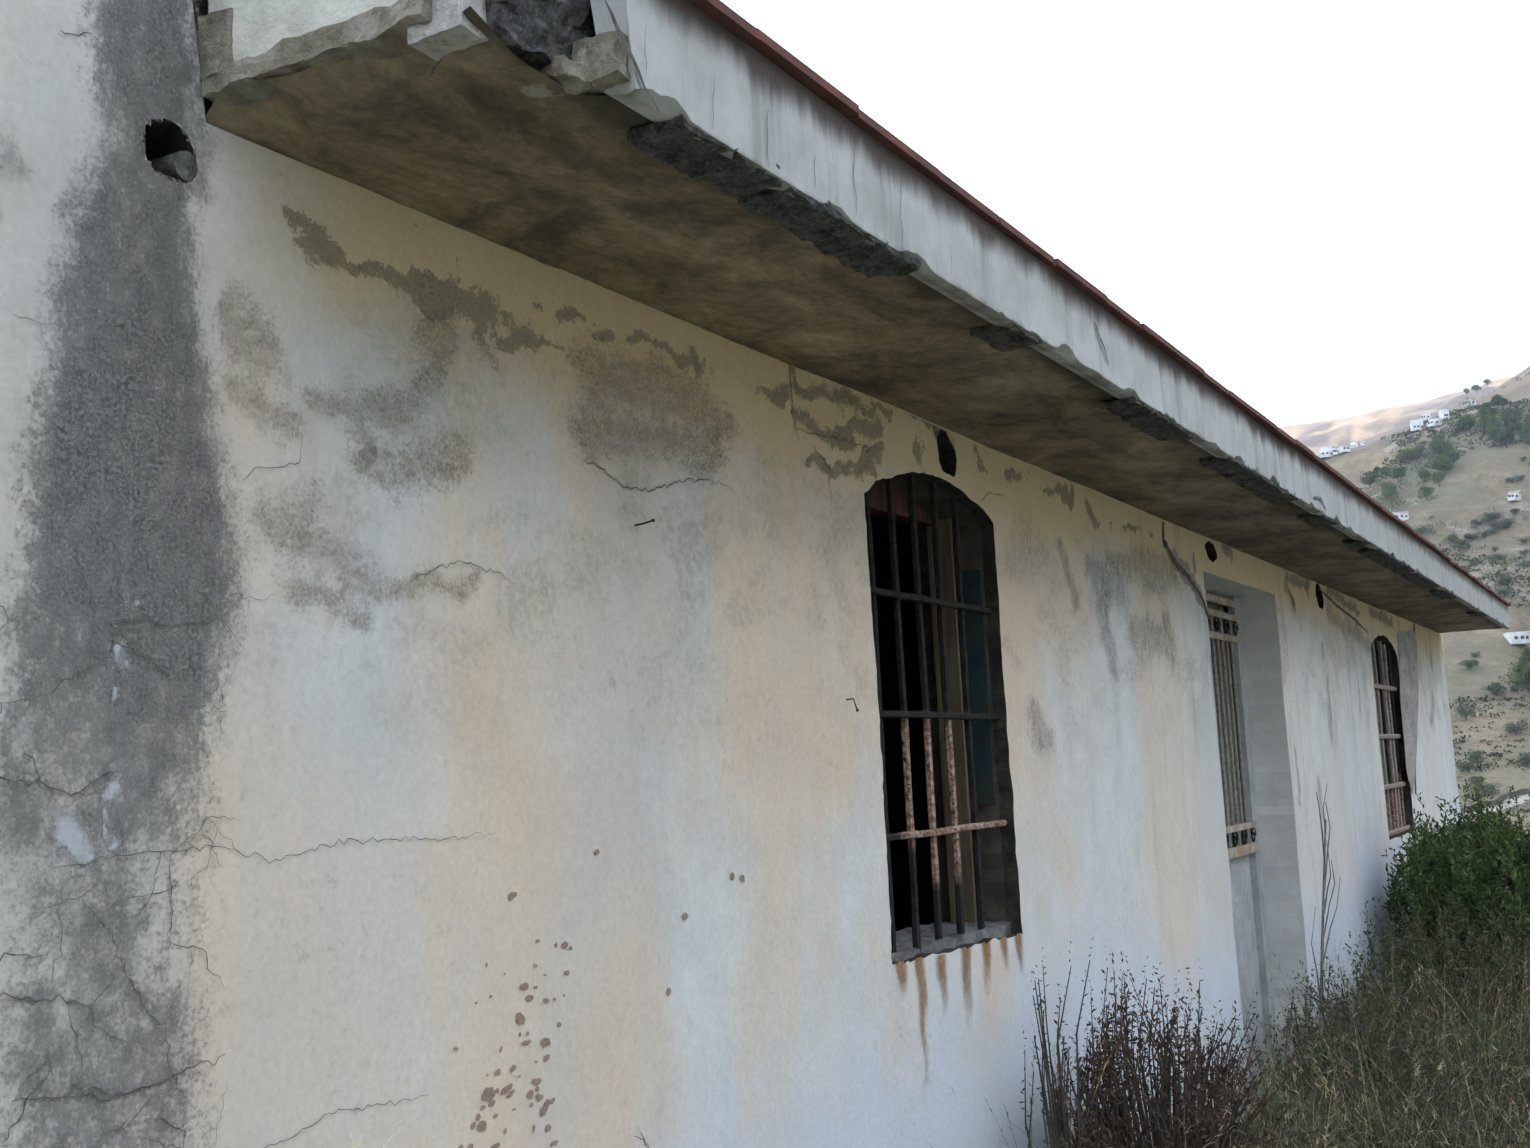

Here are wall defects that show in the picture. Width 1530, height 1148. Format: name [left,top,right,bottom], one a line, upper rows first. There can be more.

spalling [201,0,432,106]
spalling [627,114,922,278]
crack [243,431,302,480]
peeling [220,206,734,488]
spalling [970,324,1042,352]
spalling [1098,397,1195,441]
leakage [0,0,243,1148]
crack [0,553,276,737]
spalling [1199,456,1487,617]
crack [0,744,114,797]
crack [0,816,493,1148]
rust [897,933,1022,1047]